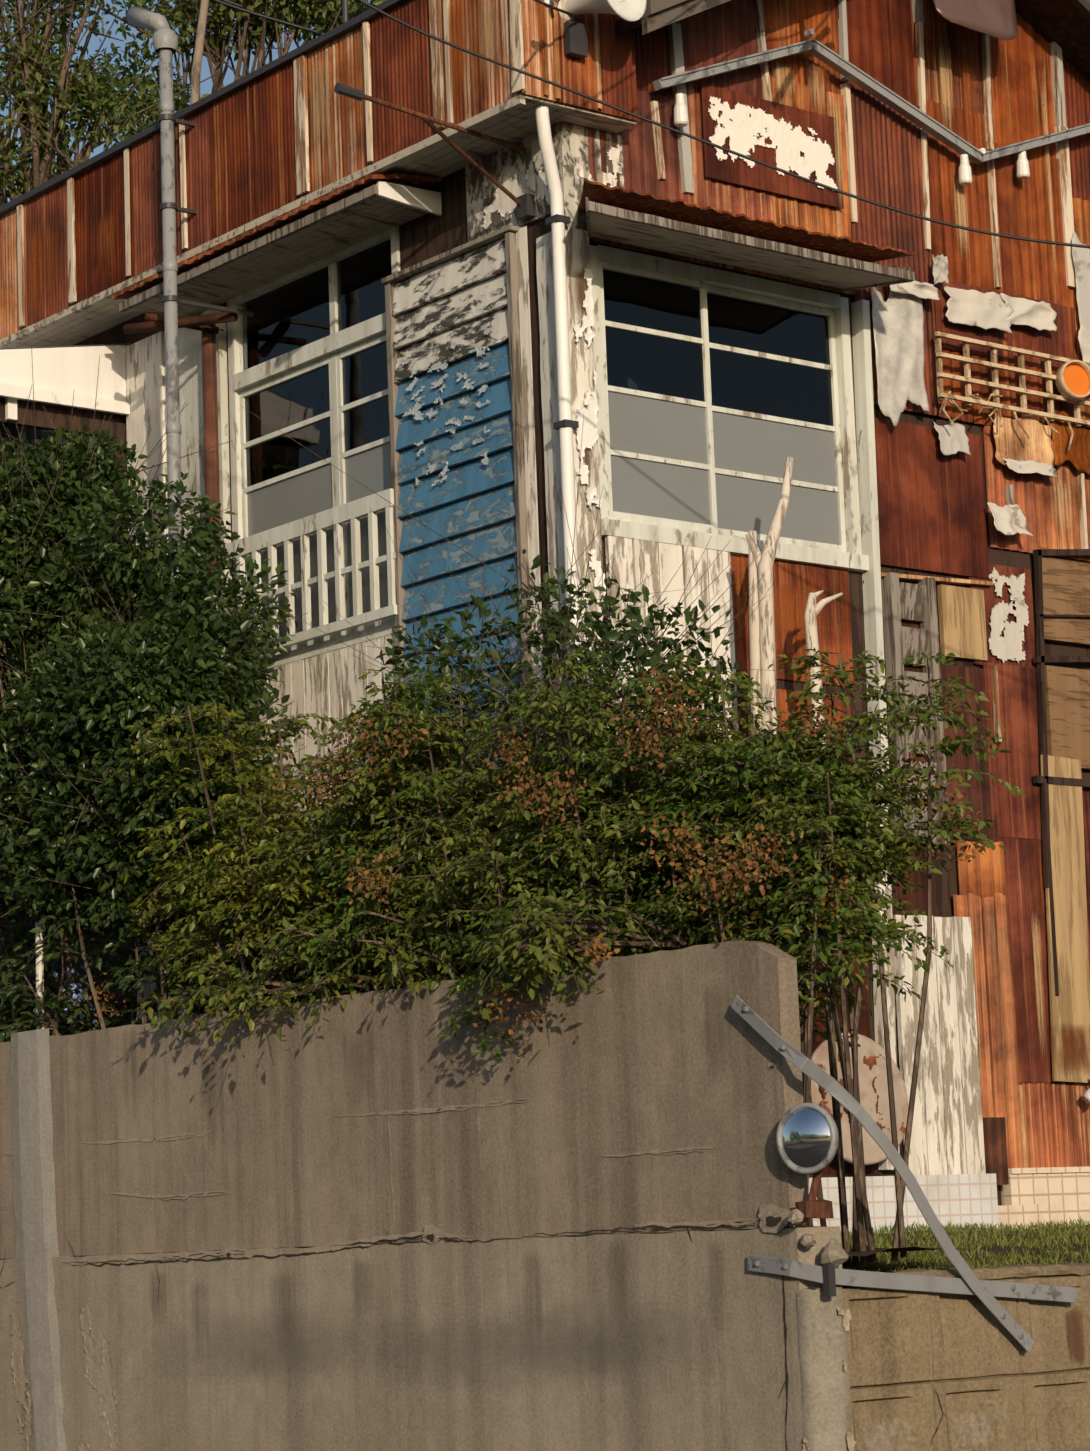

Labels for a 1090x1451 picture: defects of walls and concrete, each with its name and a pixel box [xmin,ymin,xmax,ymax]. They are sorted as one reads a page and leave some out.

corrosion [440,0,498,93]
corrosion [939,47,971,120]
flaking render [482,160,550,229]
flaking render [577,145,622,187]
peeling [708,96,838,189]
corrosion [954,179,967,245]
corrosion [1017,88,1054,261]
peeling [401,327,492,486]
peeling [988,567,1029,663]
corrosion [1033,926,1043,1027]
corrosion [863,1054,906,1133]
crack [64,1223,750,1294]